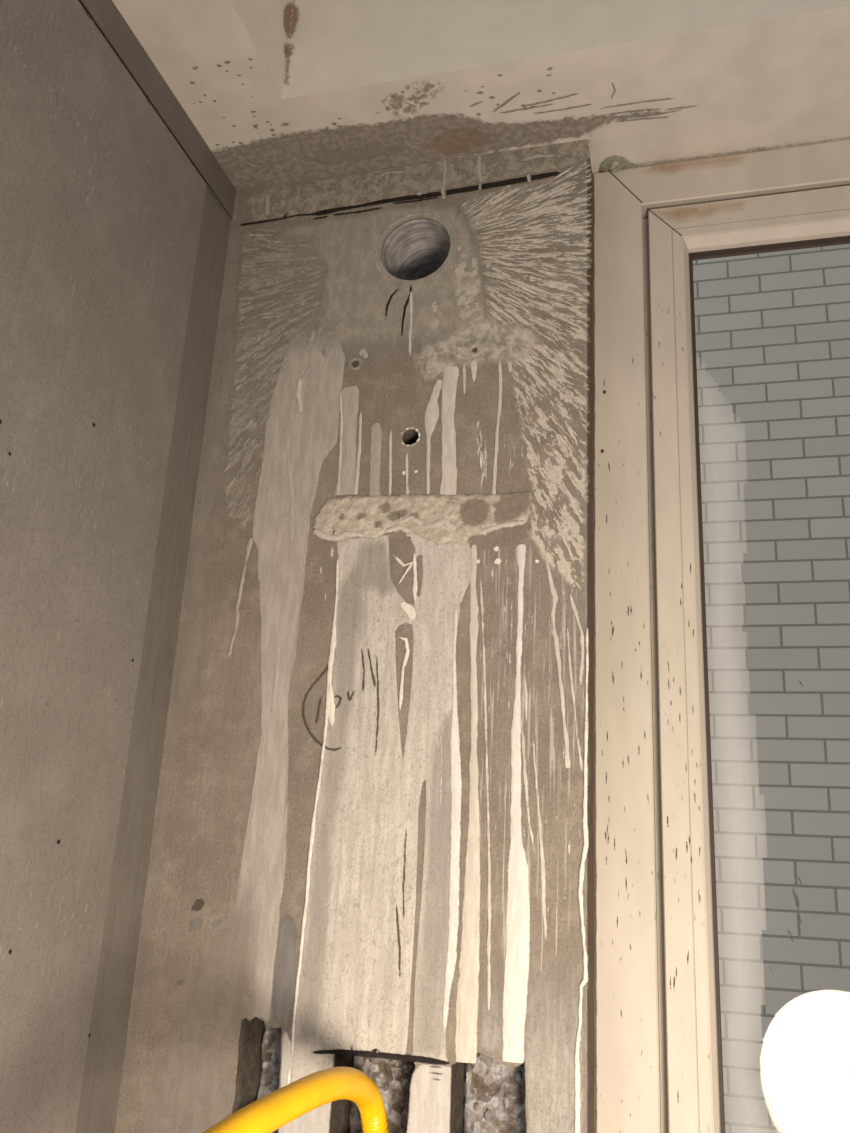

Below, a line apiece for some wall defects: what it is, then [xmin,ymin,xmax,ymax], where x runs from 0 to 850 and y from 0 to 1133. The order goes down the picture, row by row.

rust [284,3,299,83]
crack [79,0,560,226]
water stain [213,83,696,215]
crack [385,286,412,334]
water stain [492,165,584,473]
water stain [477,422,487,485]
spalling [359,503,418,528]
peeling [460,494,530,526]
water stain [532,468,583,562]
water stain [272,916,295,1029]